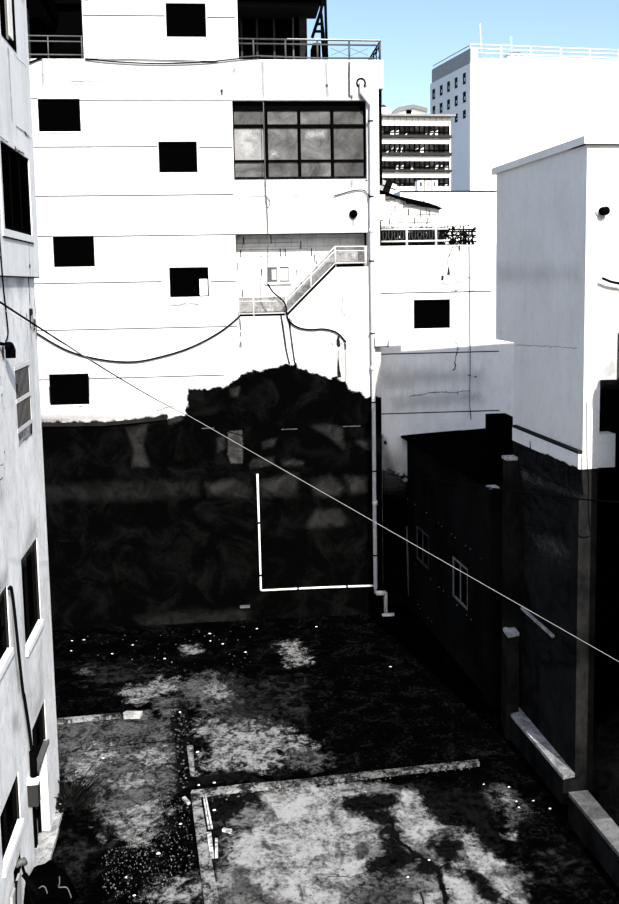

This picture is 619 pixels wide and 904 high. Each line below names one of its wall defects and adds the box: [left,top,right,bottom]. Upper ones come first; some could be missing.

crack [409,339,477,397]